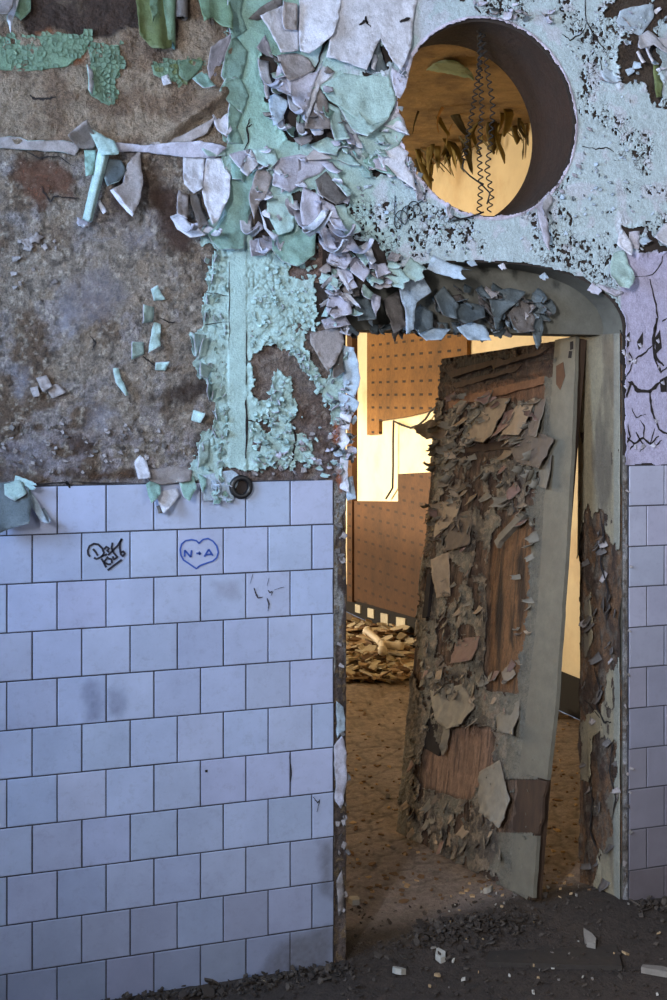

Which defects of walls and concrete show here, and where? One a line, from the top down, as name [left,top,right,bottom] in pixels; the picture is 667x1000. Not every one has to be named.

peeling [473,0,564,25]
flaking render [565,0,667,109]
peeling [480,109,528,164]
peeling [521,148,650,251]
peeling [587,213,667,297]
peeling [431,283,556,350]
crack [620,251,667,451]
flaking render [0,0,481,963]
flaking render [576,332,643,900]